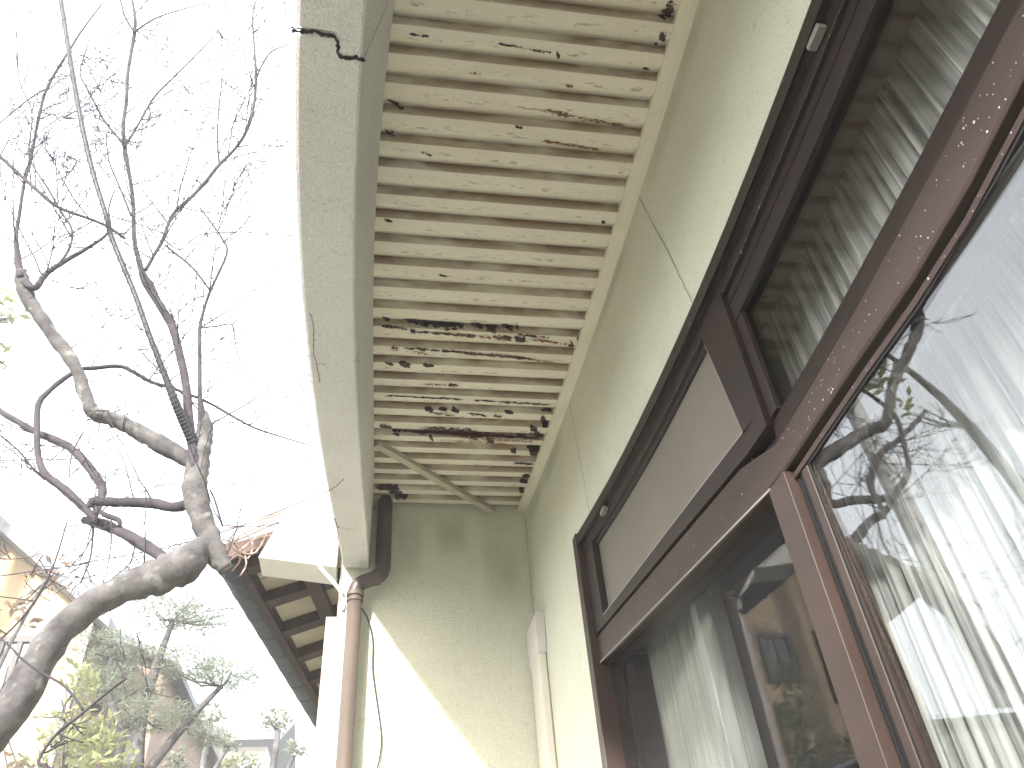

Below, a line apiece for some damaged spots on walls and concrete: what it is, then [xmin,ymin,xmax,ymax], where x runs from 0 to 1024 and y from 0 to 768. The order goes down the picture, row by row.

crack [291,1,389,62]
rust [542,108,627,127]
rust [542,139,599,151]
rust [382,324,567,363]
rust [379,423,540,444]